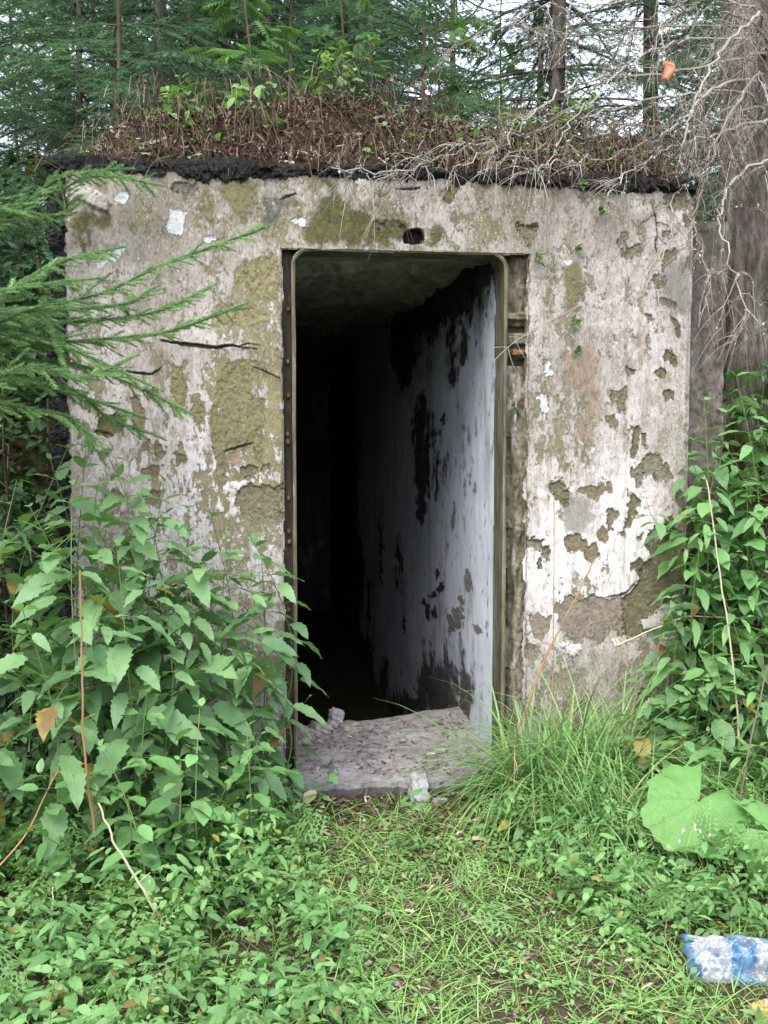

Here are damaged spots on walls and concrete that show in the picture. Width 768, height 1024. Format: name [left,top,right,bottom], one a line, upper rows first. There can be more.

leakage [324,180,341,203]
peeling [616,231,642,260]
peeling [652,228,693,289]
leakage [387,263,496,392]
crack [160,339,280,379]
peeling [605,366,635,426]
peeling [654,348,677,402]
peeling [93,360,285,523]
crack [224,442,254,452]
leakage [411,389,449,526]
peeling [522,426,686,662]
leakage [353,513,475,720]